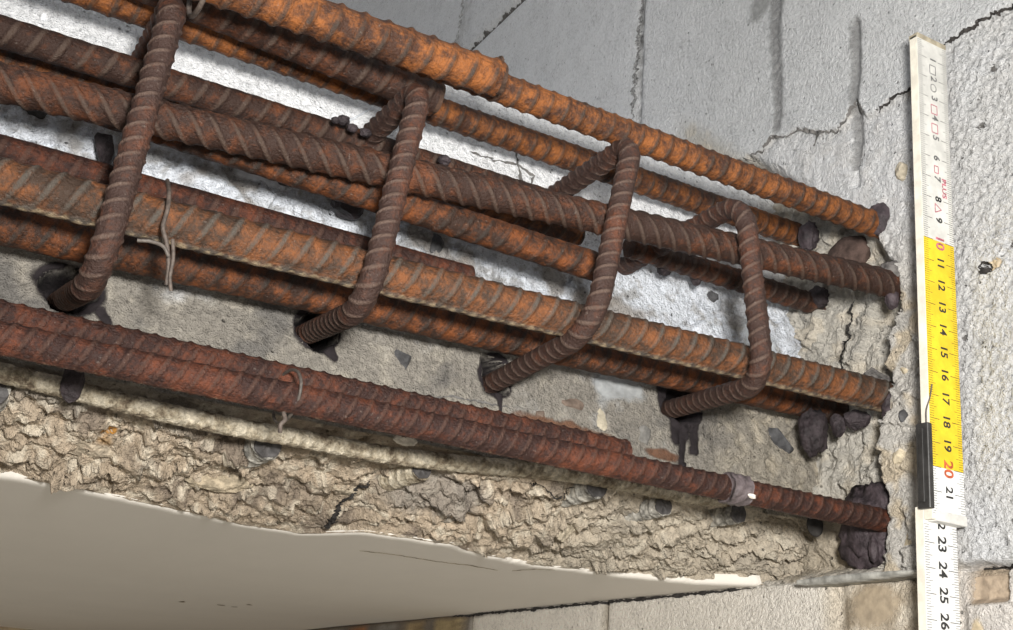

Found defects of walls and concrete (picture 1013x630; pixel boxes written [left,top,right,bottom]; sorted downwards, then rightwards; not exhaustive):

spalling [0,134,114,264]
spalling [0,14,144,133]
spalling [113,174,371,314]
spalling [0,299,751,500]
spalling [361,244,585,357]
spalling [150,0,902,313]
spalling [734,351,894,424]
crack [744,87,911,162]
crack [839,302,854,369]
crack [943,4,1013,45]
crack [324,481,370,530]
spalling [746,481,891,533]